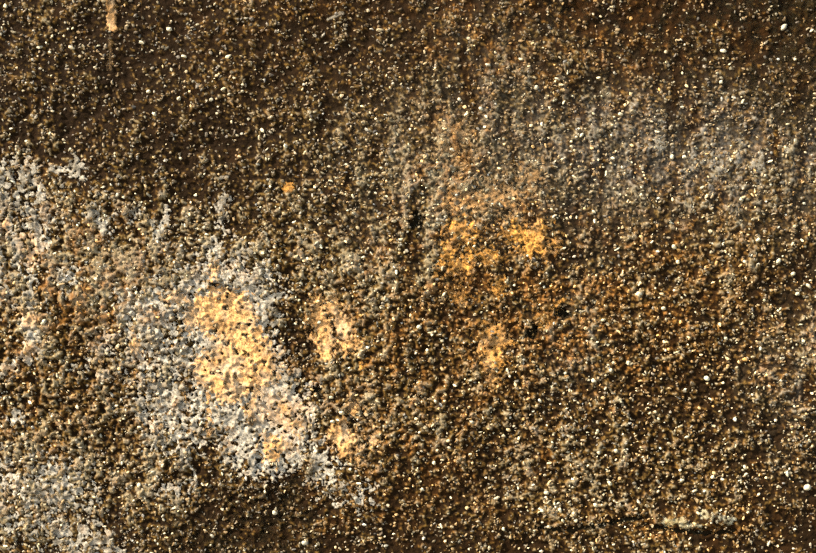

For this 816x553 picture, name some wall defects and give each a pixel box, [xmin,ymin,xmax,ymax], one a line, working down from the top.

rust [106,0,117,31]
rust [430,115,562,300]
rust [157,260,285,436]
rust [304,293,363,362]
rust [477,310,514,389]
rust [255,400,304,471]